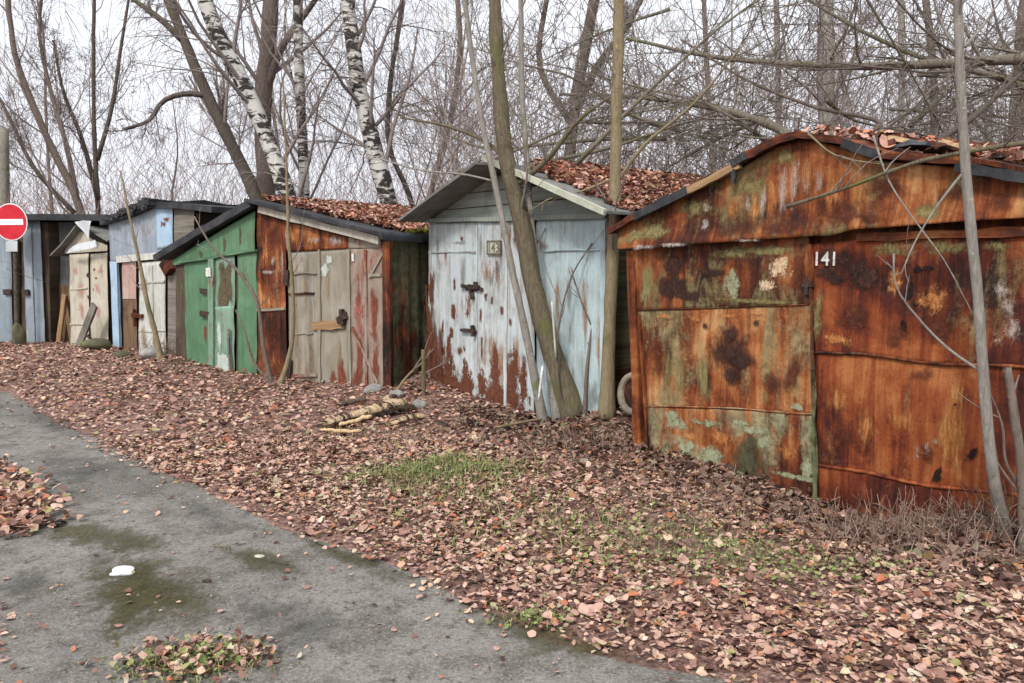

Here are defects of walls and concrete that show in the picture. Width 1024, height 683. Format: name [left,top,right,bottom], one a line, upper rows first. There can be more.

rust [716,182,793,235]
rust [817,173,901,225]
peeling [217,322,233,372]
peeling [352,286,379,386]
peeling [424,272,531,411]
rust [691,314,756,385]
rust [765,355,801,391]
rust [919,291,951,343]
rust [923,416,963,472]